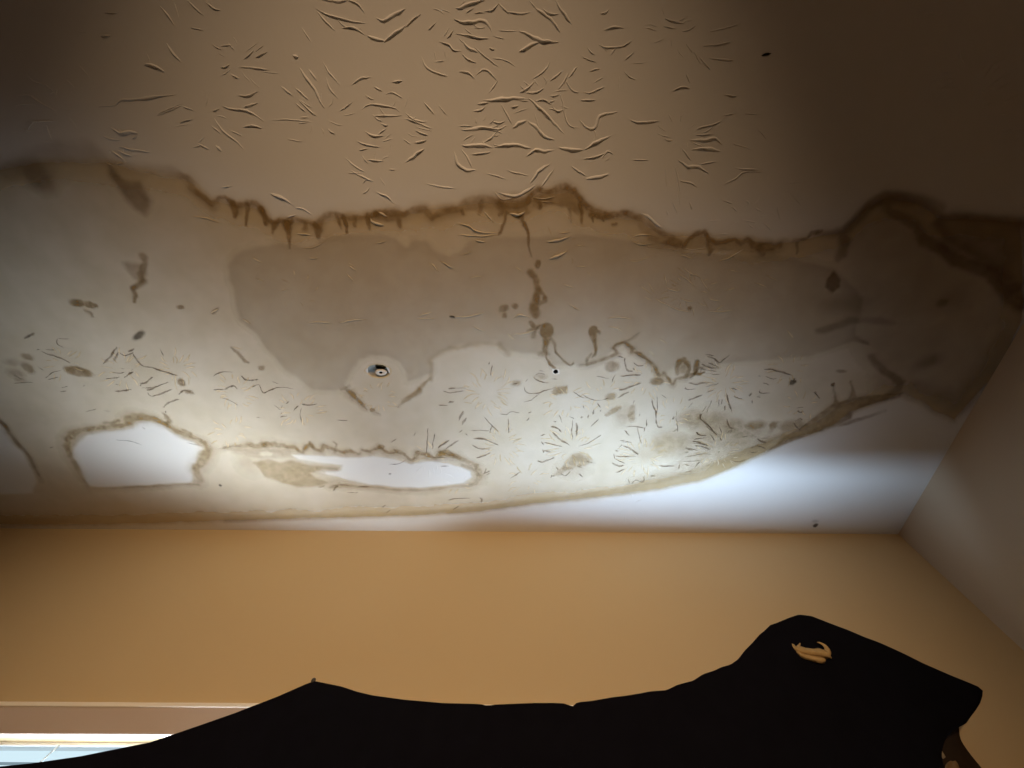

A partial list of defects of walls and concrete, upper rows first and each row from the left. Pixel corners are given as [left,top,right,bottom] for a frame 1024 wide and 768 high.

damp [176,182,322,242]
damp [337,185,838,258]
damp [530,261,569,366]
crack [107,350,183,401]
damp [613,342,671,383]
damp [87,415,208,454]
damp [286,444,457,460]
crack [426,388,509,473]
crack [515,355,790,482]
damp [686,448,764,480]
damp [0,509,430,524]
damp [446,494,558,512]